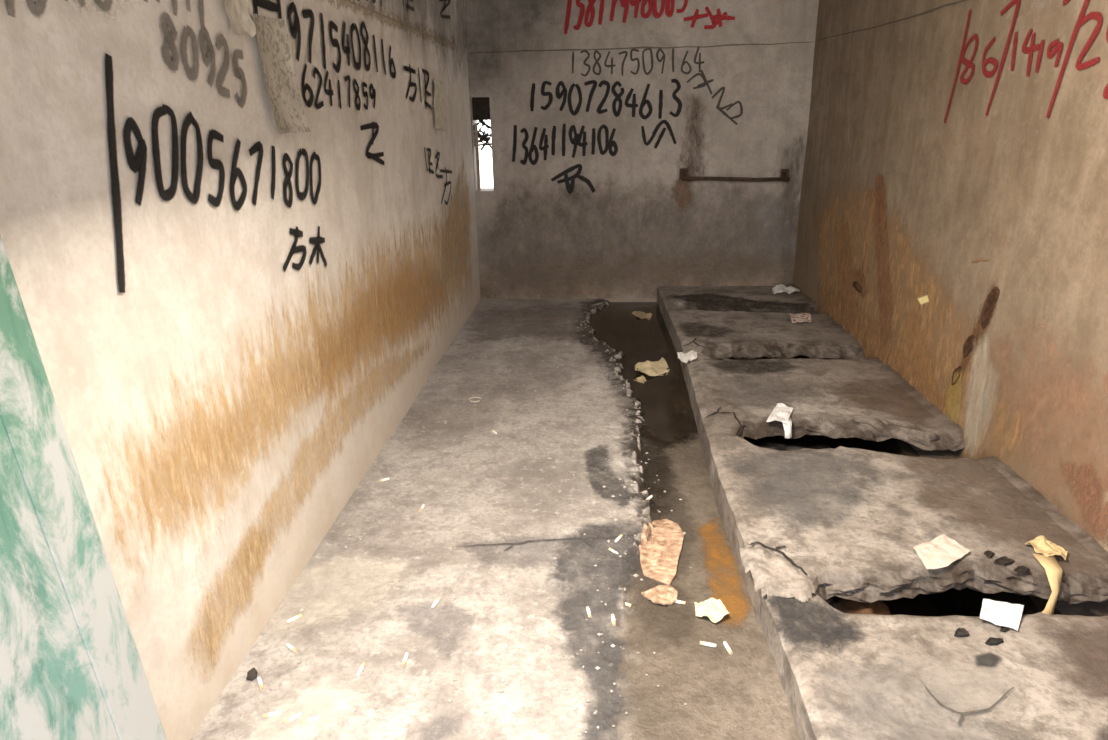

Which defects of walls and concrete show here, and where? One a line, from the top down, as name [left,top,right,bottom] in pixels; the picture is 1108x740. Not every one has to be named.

corrosion [109,175,471,670]
damp [466,186,809,740]
corrosion [699,524,749,622]
crack [920,680,1014,725]